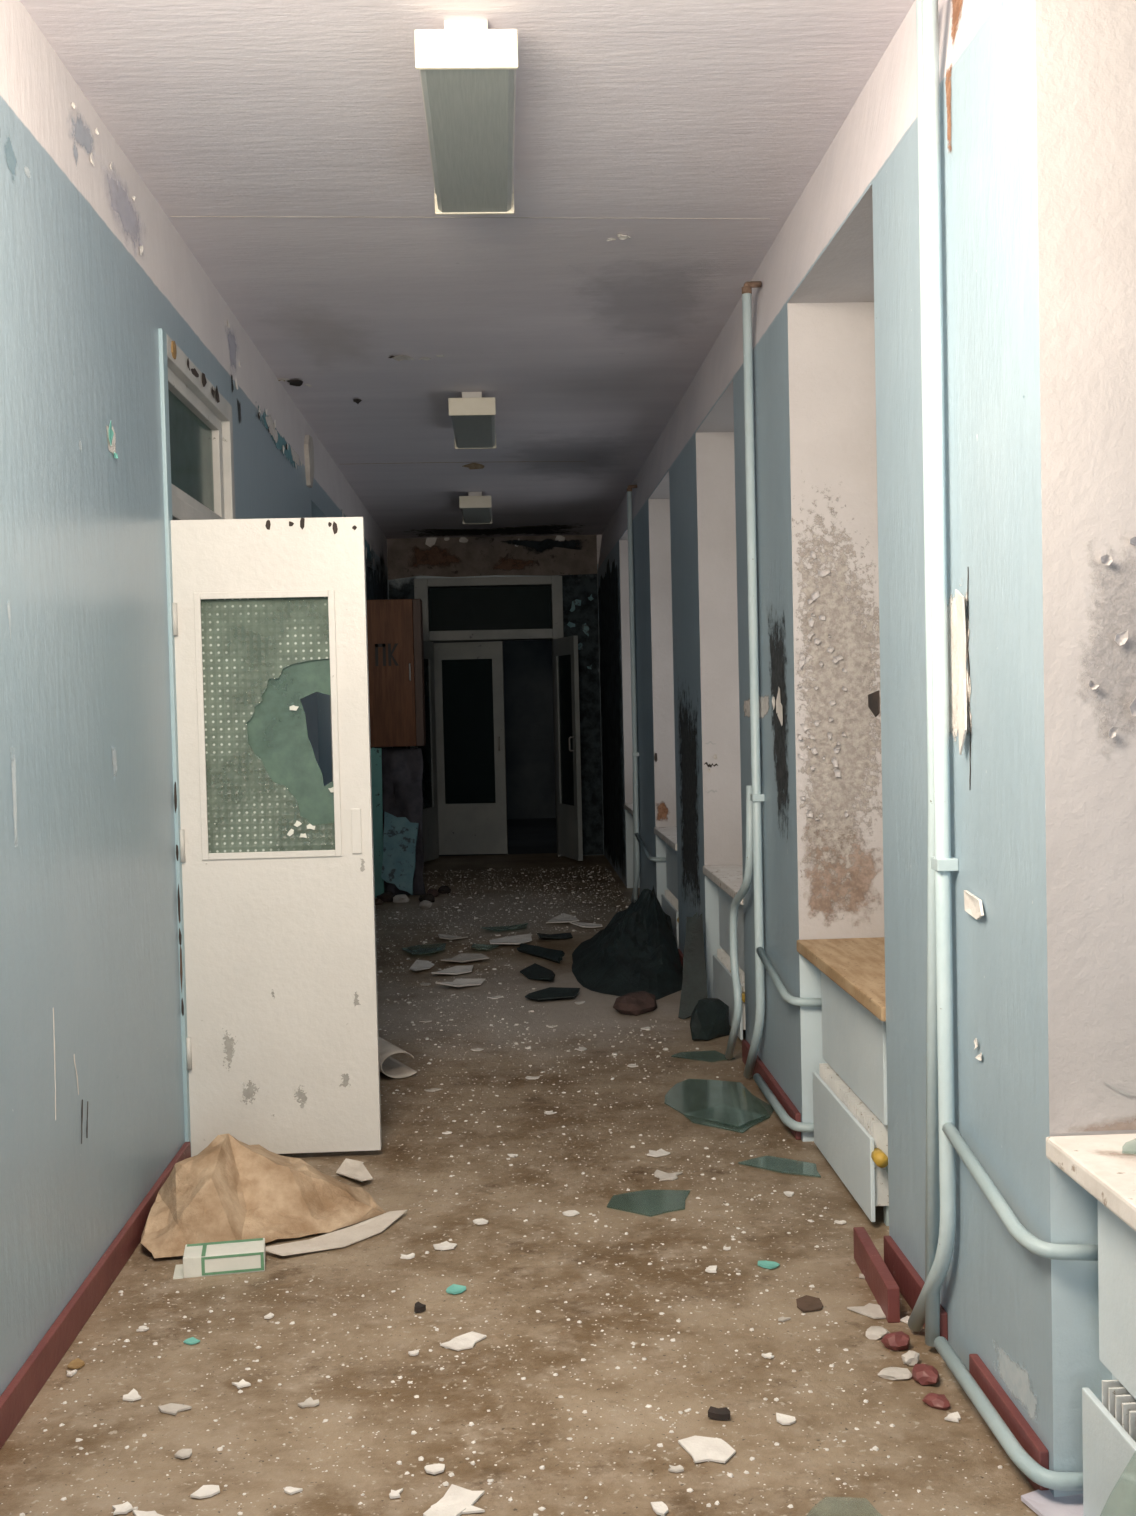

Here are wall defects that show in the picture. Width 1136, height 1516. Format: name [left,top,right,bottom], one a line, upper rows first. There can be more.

spalling [5,137,30,180]
peeling [71,102,143,255]
flaking render [425,537,468,547]
peeling [744,491,882,919]